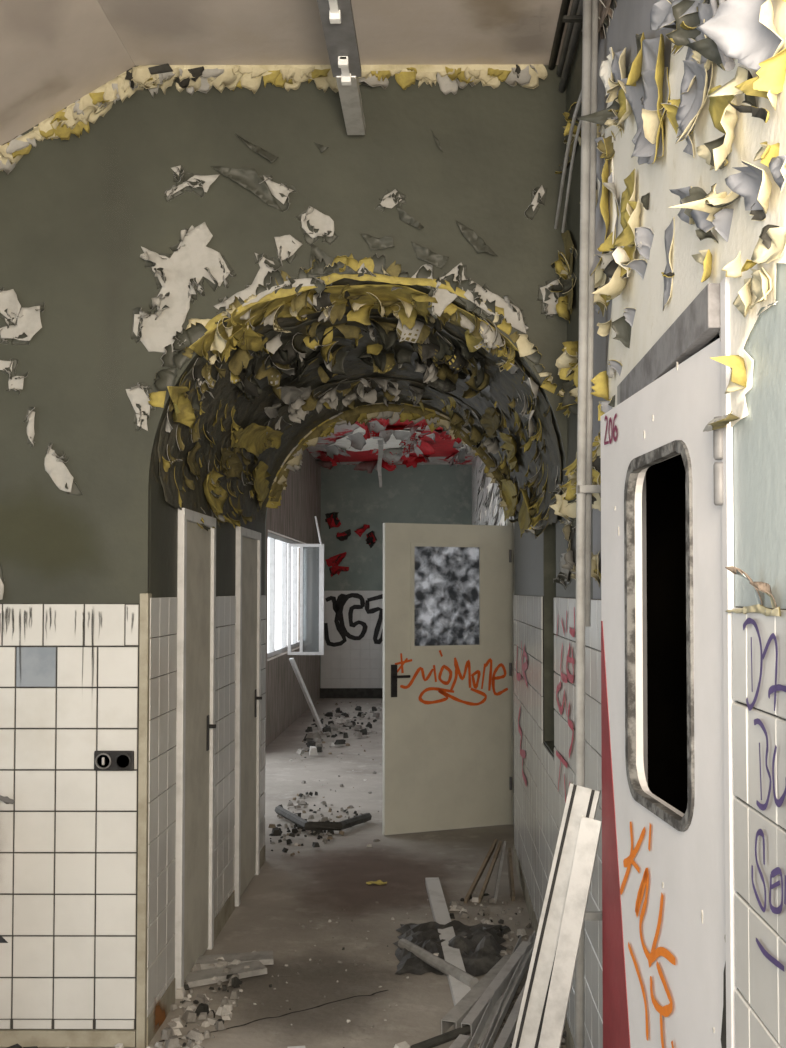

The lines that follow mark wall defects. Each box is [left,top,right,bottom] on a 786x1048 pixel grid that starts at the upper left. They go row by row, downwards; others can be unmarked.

peeling [0,63,339,174]
peeling [0,287,45,345]
peeling [126,0,786,590]
peeling [0,359,29,395]
peeling [23,407,83,496]